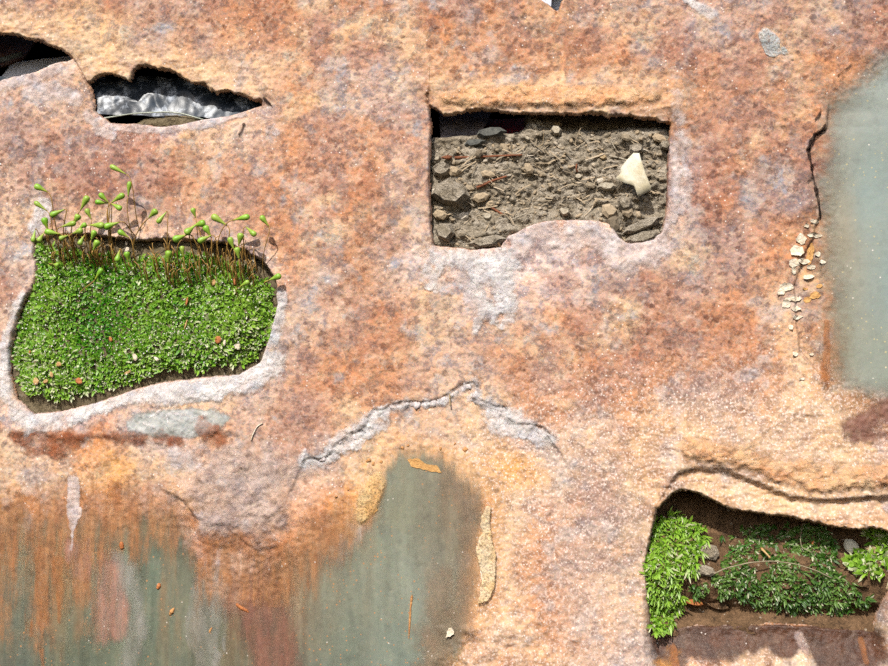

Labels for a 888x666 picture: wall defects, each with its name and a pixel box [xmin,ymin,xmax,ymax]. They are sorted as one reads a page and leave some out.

crack [806,108,826,219]
rust [622,216,665,234]
rust [466,235,507,248]
rust [9,431,92,459]
rust [104,431,182,447]
leakage [168,445,202,470]
rust [200,417,225,445]
rust [842,399,888,442]
leakage [67,476,82,547]
peeling [843,539,859,553]
rust [0,485,177,638]
rust [198,514,352,613]